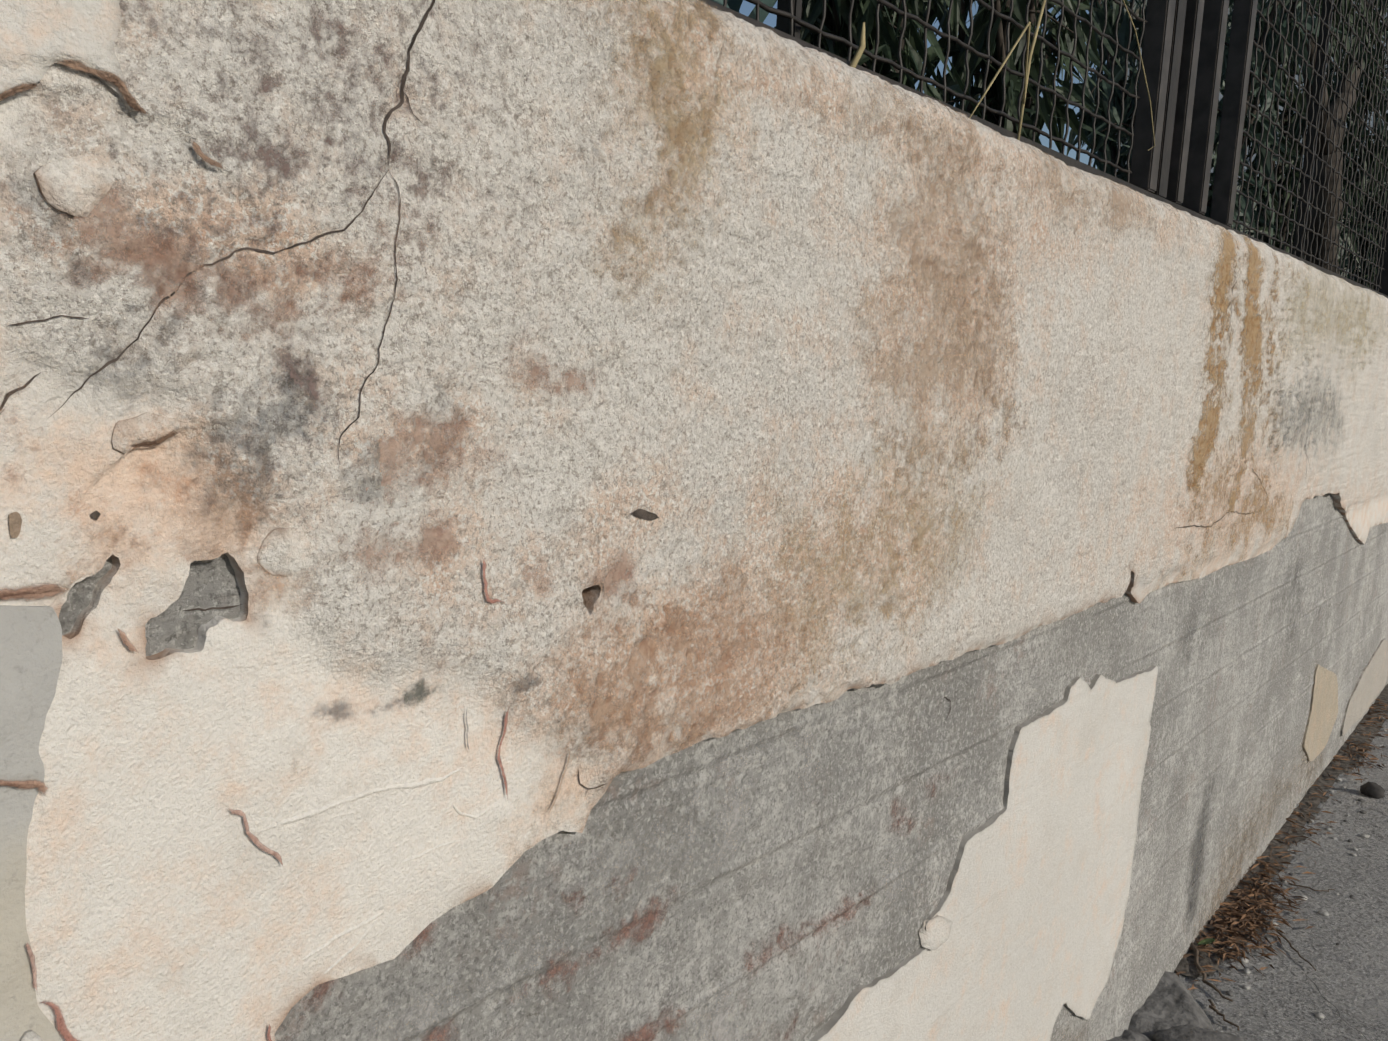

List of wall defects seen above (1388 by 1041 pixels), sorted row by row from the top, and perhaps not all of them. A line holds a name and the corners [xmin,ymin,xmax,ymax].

crack [47,0,435,459]
crack [11,315,88,325]
crack [0,373,40,414]
flaking render [130,431,177,452]
corrosion [1187,230,1293,547]
spalling [9,512,22,538]
spalling [117,554,240,656]
peeling [0,557,112,1041]
peeling [229,809,283,865]
spalling [267,493,1388,1041]